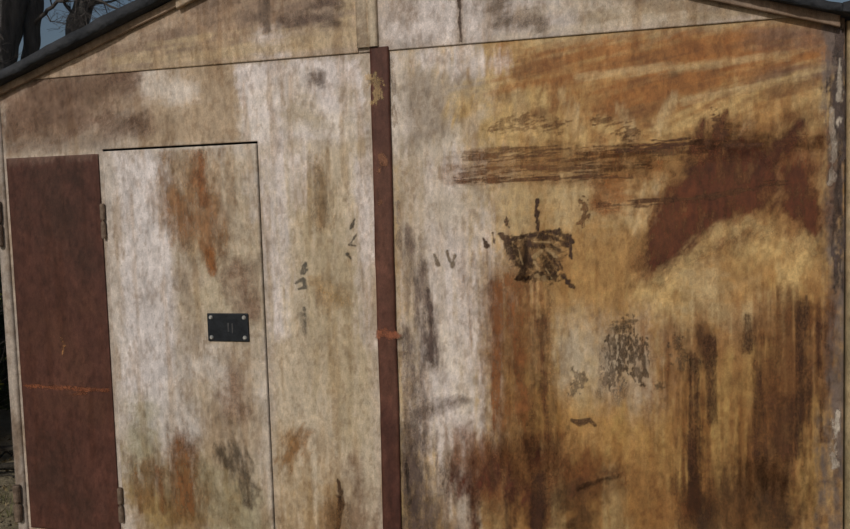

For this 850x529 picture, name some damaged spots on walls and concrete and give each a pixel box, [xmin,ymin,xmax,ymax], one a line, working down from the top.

rust [161,150,229,275]
peeling [483,198,575,289]
peeling [576,195,590,228]
rust [453,109,825,286]
rust [447,245,614,529]
peeling [568,367,588,396]
peeling [600,315,665,397]
rust [673,291,829,529]
rust [135,436,198,525]